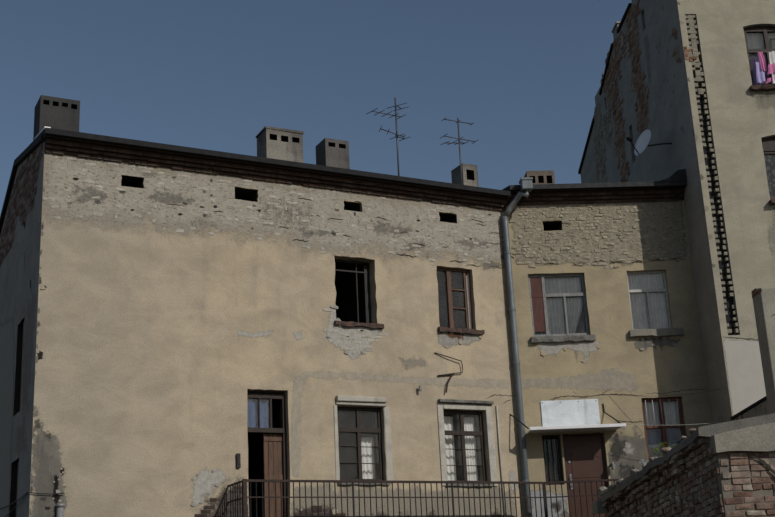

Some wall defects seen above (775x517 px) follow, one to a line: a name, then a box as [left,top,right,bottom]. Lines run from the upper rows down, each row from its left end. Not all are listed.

flaking render [593,0,650,183]
flaking render [0,142,689,269]
flaking render [323,304,387,360]
flaking render [438,332,482,348]
flaking render [537,341,601,363]
crack [549,389,703,401]
water stain [30,410,68,517]
flaking render [191,468,225,507]
water stain [608,423,648,485]